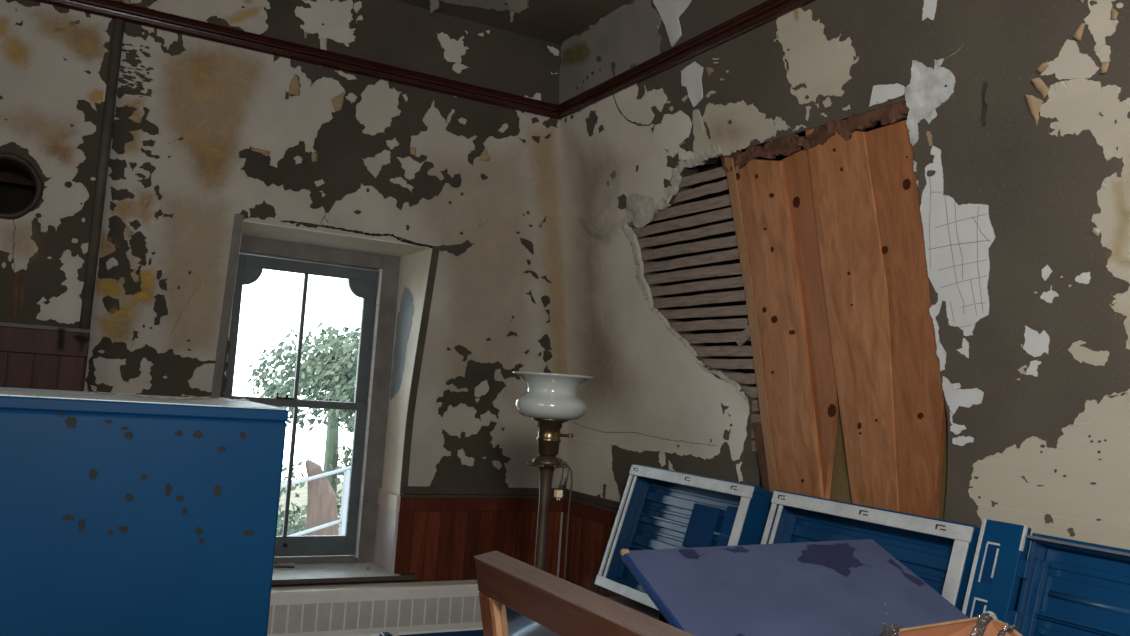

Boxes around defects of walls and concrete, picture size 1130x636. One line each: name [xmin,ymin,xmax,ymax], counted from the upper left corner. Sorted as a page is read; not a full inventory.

peeling [0,0,270,401]
crack [281,212,475,248]
peeling [238,0,918,502]
peeling [1025,0,1130,350]
peeling [929,299,969,371]
peeling [1017,326,1050,380]
peeling [1068,340,1110,366]
peeling [949,411,974,446]
peeling [968,388,1130,560]